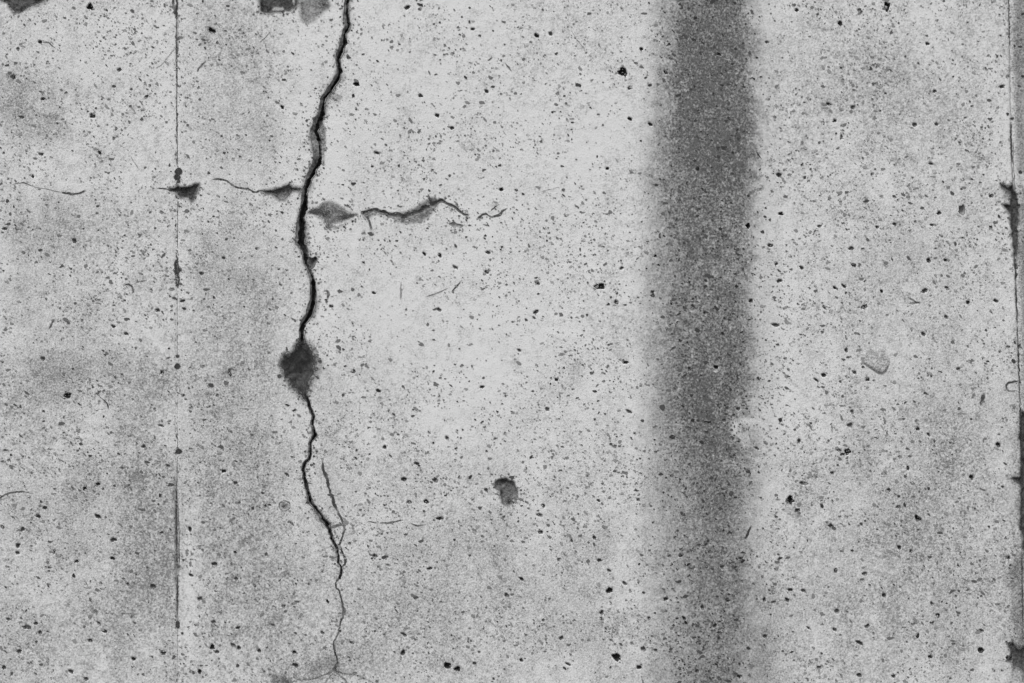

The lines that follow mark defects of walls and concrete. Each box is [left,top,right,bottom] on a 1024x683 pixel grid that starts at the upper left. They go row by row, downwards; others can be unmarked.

crack [213,0,351,346]
crack [361,195,506,228]
water stain [651,0,761,683]
crack [301,392,421,679]